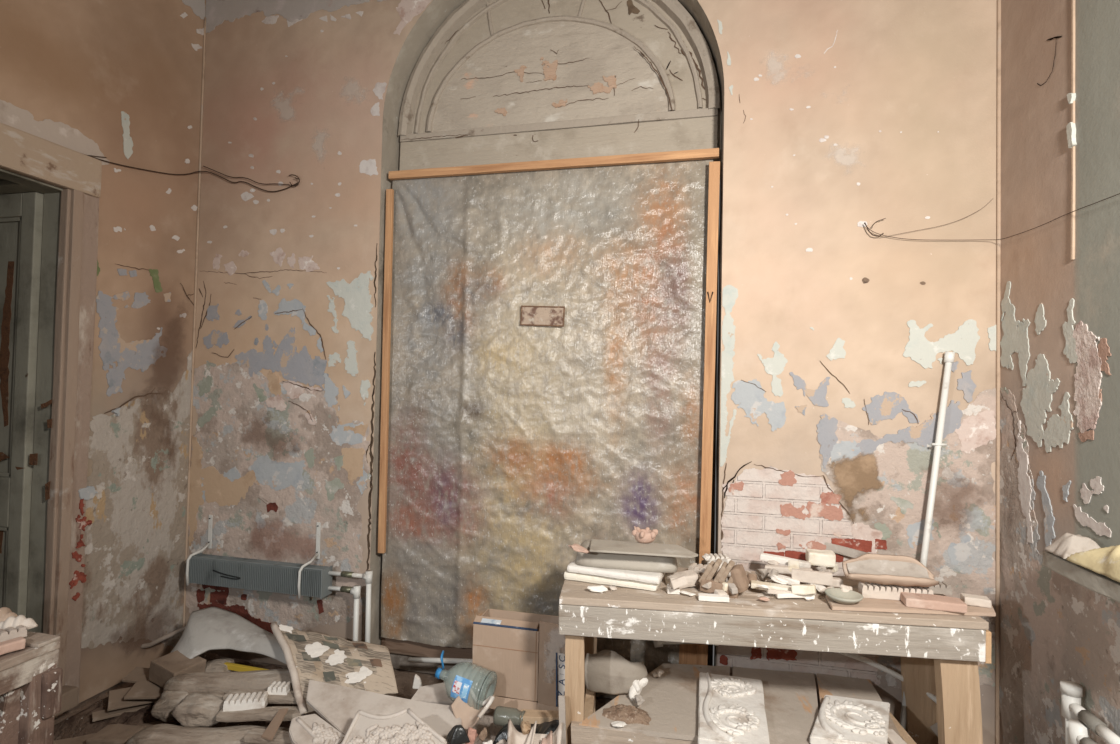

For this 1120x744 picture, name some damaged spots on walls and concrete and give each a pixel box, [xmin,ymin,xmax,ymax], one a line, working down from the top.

crack [463,0,706,111]
peeling [0,99,133,172]
crack [403,133,468,141]
peeling [269,229,320,272]
peeling [0,452,38,470]
flaking render [69,241,377,649]
crack [722,461,854,524]
leakage [831,454,882,521]
flaking render [717,281,1120,744]